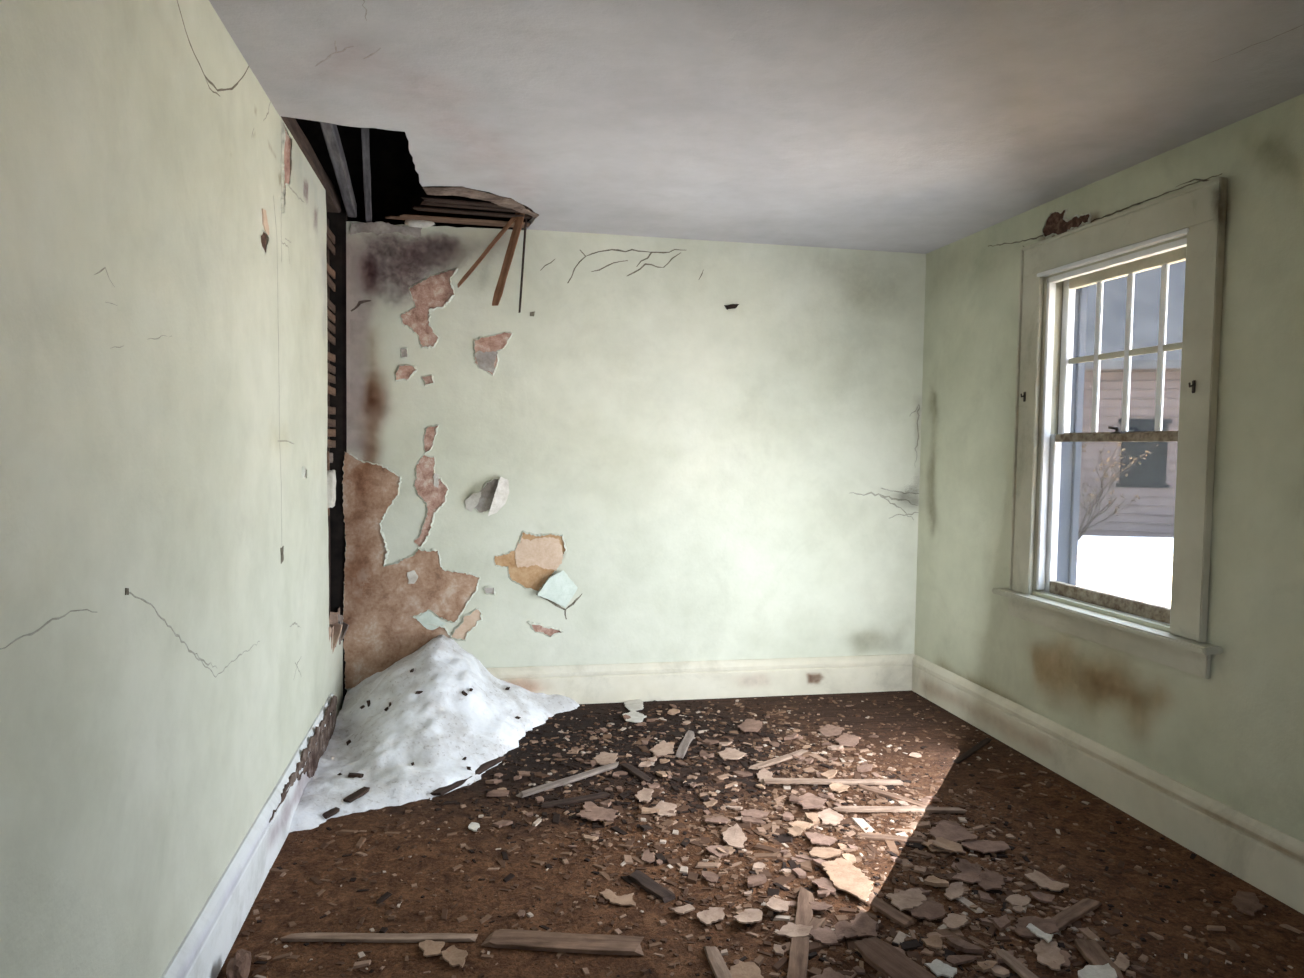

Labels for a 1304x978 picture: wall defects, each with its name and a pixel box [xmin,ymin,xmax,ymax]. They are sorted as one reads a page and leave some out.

crack [177,0,249,96]
peeling [259,120,292,255]
crack [540,249,703,283]
peeling [472,331,513,376]
peeling [269,184,496,823]
peeling [465,477,509,516]
crack [851,405,920,520]
peeling [493,530,578,608]
crack [0,609,97,649]
crack [129,592,260,678]
peeling [526,621,564,637]